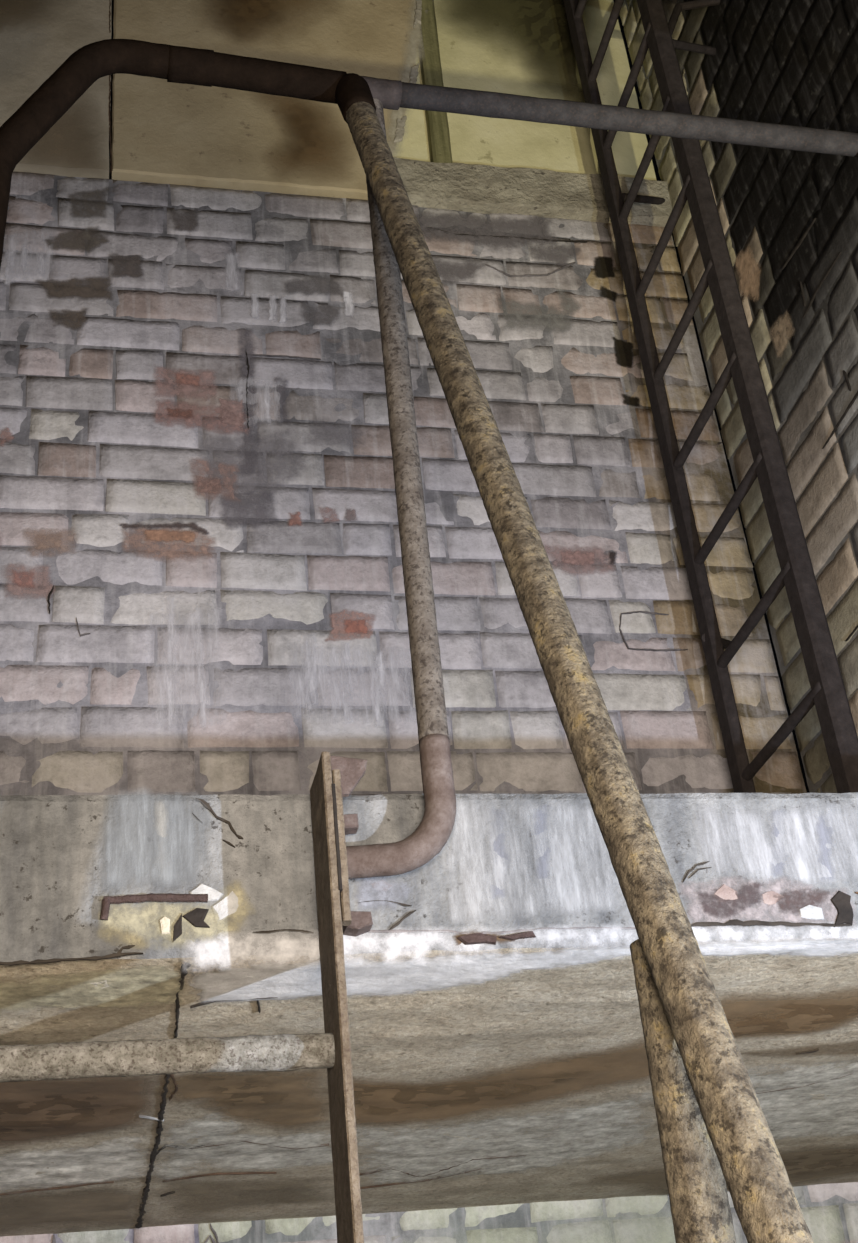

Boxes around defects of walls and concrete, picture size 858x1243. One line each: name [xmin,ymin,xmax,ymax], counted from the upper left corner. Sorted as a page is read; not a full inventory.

leakage [278,98,336,166]
peeling [736,250,760,298]
peeling [773,315,793,356]
peeling [155,368,247,433]
peeling [7,530,74,596]
peeling [121,522,211,559]
peeling [327,610,372,641]
spalling [682,878,854,928]
crack [174,962,278,1038]
crack [135,1074,203,1228]
crack [204,1223,219,1243]